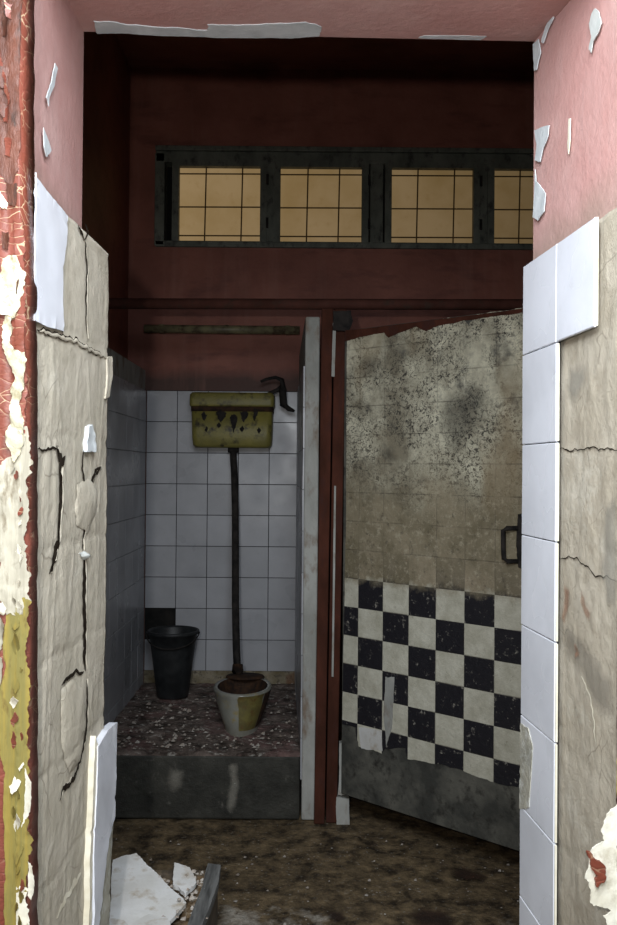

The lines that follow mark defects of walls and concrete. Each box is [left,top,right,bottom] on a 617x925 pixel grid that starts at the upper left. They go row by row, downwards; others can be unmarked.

peeling [94,21,322,39]
peeling [533,16,554,71]
peeling [588,8,602,53]
peeling [0,0,22,209]
peeling [533,125,550,221]
crack [560,445,617,453]
spalling [0,214,113,925]
spalling [554,208,617,925]
crack [561,556,616,582]
crack [38,446,102,800]
spalling [109,853,197,925]
water stain [411,909,451,925]